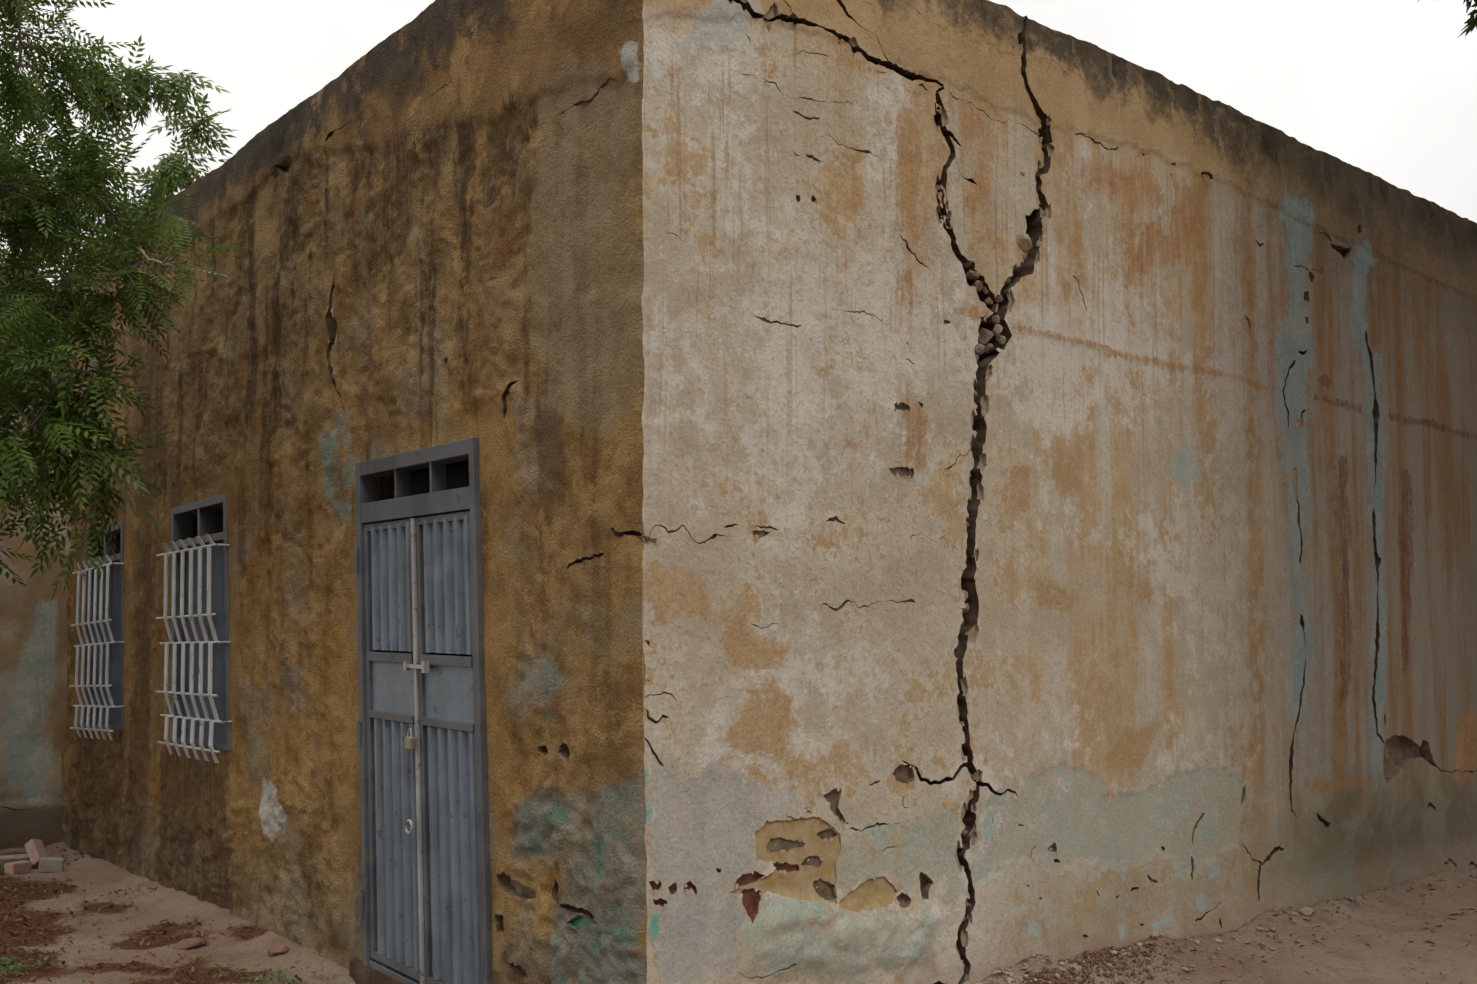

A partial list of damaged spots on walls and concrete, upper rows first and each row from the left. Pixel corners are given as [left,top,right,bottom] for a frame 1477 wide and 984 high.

leakage [865,0,1477,808]
crack [1283,350,1307,428]
spalling [889,467,914,479]
crack [728,0,1118,984]
peeling [997,424,1095,529]
crack [1292,479,1303,563]
crack [1365,330,1386,743]
peeling [642,540,1248,984]
crack [1239,786,1247,805]
crack [1243,615,1331,900]
crack [1427,768,1477,811]
crack [1097,813,1222,928]